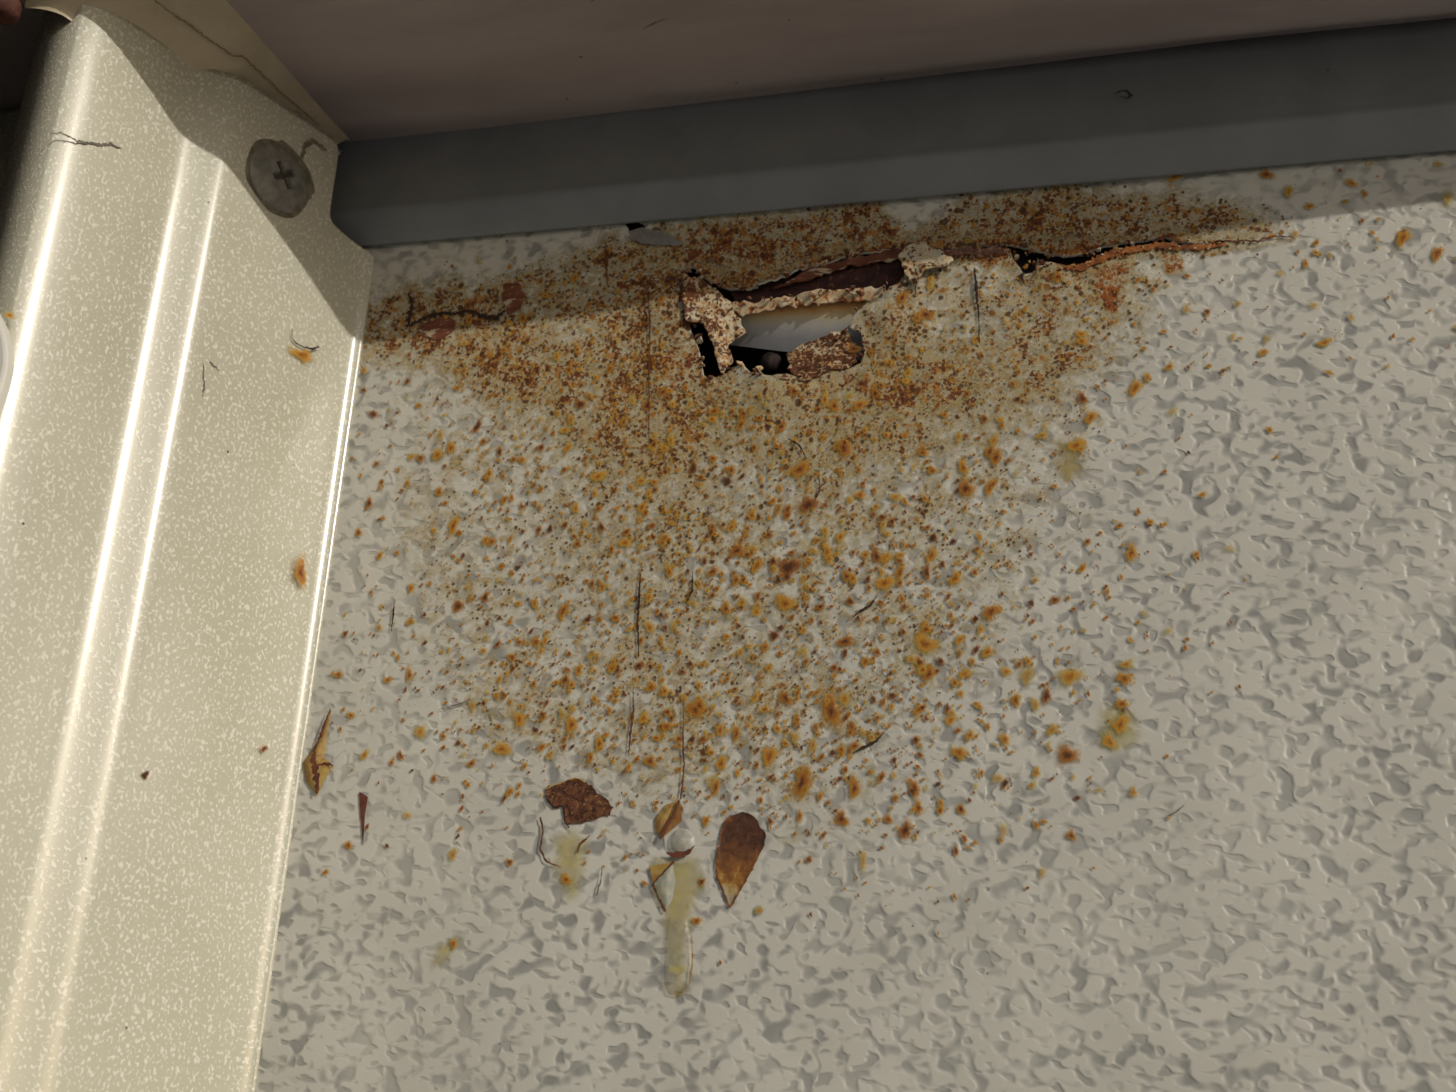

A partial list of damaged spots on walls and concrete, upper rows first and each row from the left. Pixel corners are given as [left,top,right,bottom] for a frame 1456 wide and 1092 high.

corrosion [1339,168,1411,252]
corrosion [1432,247,1456,261]
spalling [687,269,734,302]
crack [905,234,1296,343]
spalling [690,323,794,377]
corrosion [1303,314,1355,347]
corrosion [330,170,1339,897]
peeling [303,709,334,795]
spalling [545,777,613,828]
peeling [655,800,682,838]
peeling [649,861,675,912]
spalling [715,812,766,908]